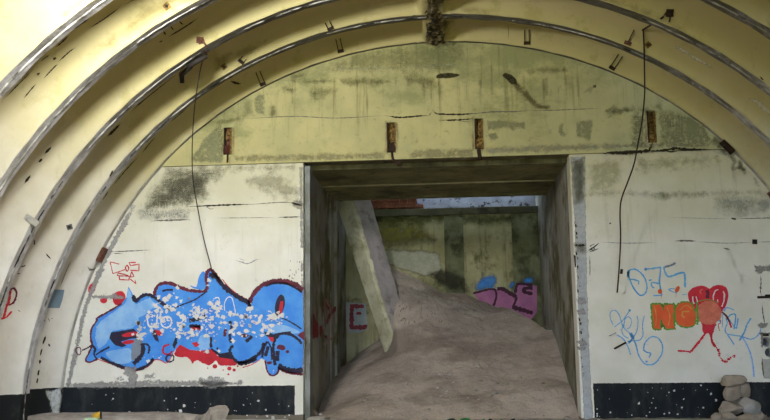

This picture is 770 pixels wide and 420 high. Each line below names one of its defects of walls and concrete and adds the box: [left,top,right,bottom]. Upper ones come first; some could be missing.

crack [246,108,599,122]
crack [600,143,711,155]
leakage [147,169,214,207]